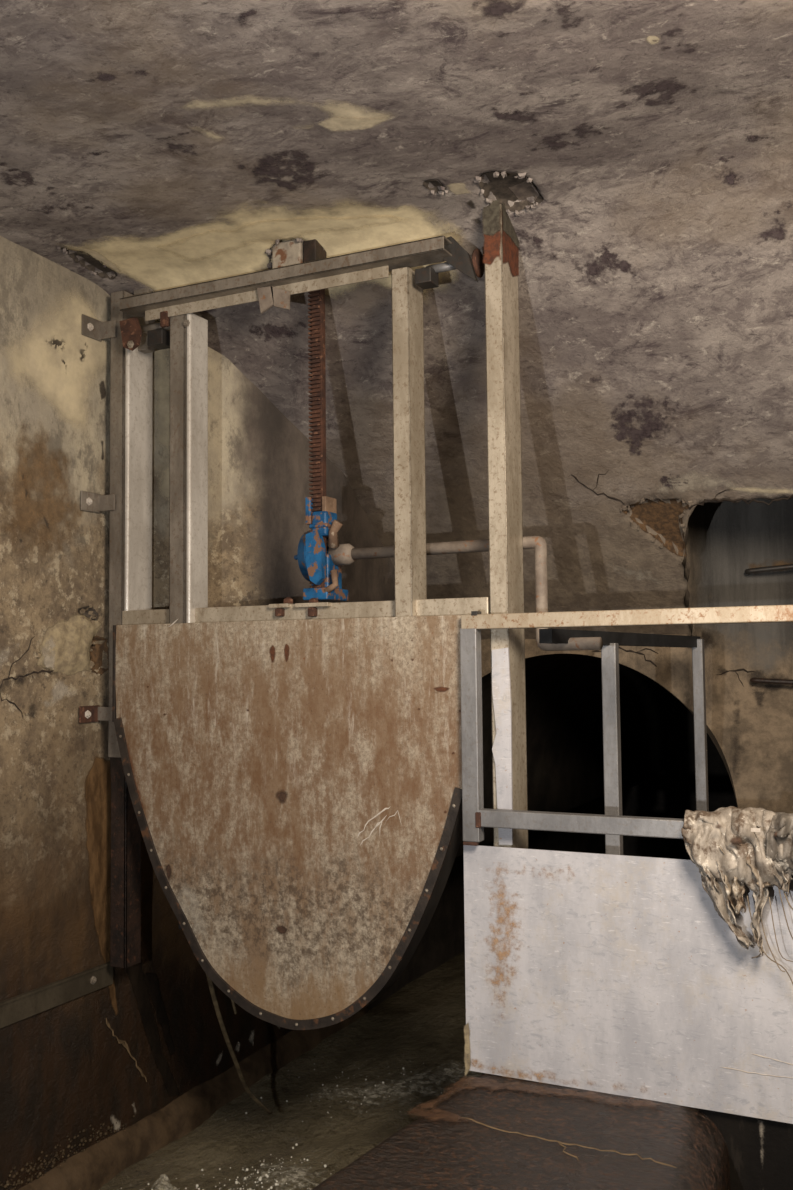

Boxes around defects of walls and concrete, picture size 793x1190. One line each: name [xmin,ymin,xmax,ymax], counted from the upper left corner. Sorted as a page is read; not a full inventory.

mould [238,151,328,191]
spalling [474,171,543,216]
spalling [57,247,119,279]
mould [577,246,633,282]
mould [611,395,678,455]
damp [9,436,81,548]
crack [571,471,625,505]
spalling [620,497,694,557]
crack [0,636,56,717]
corrosion [492,893,517,985]
crack [106,1018,147,1082]
damp [0,1115,135,1190]